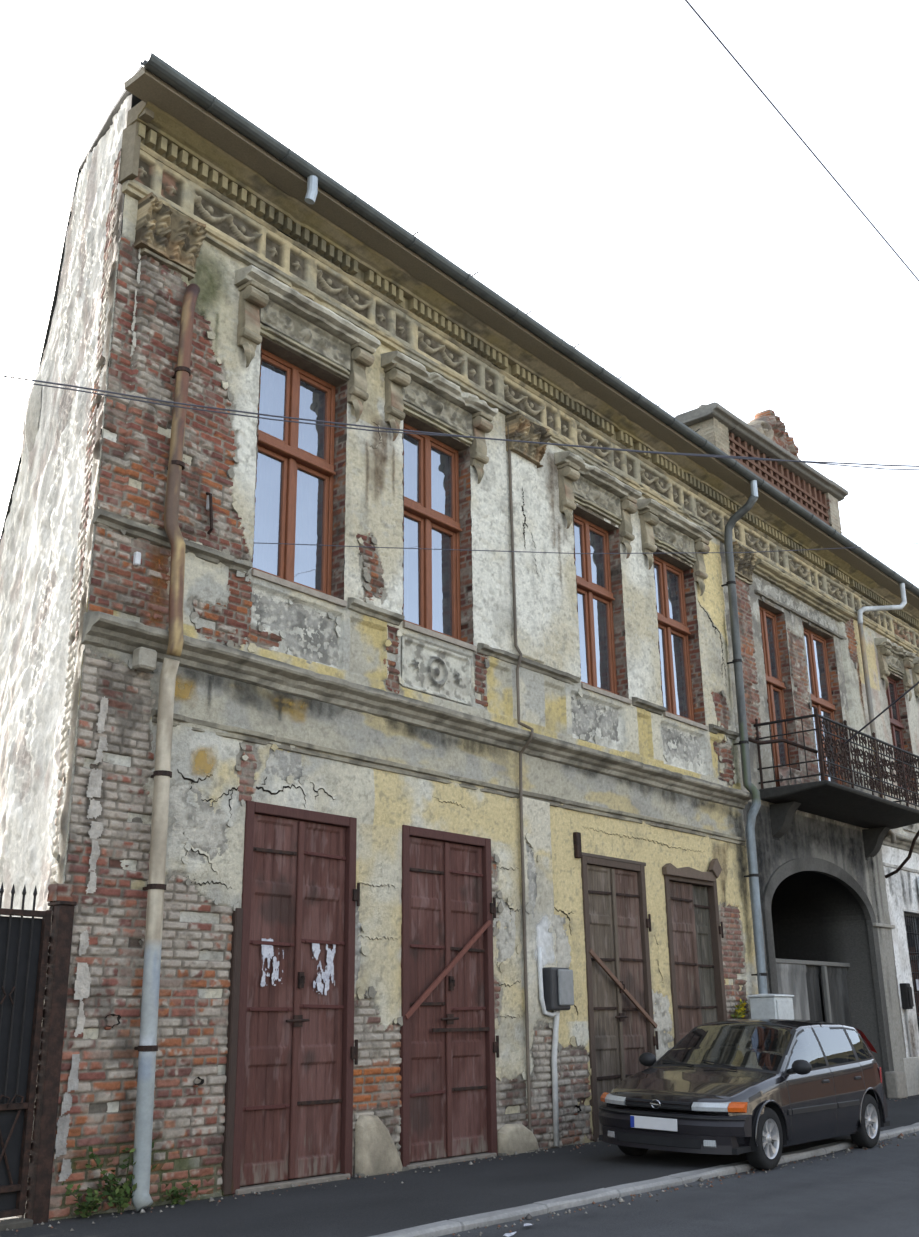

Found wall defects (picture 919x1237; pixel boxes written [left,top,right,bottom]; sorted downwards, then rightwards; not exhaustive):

flaking render [356,533,384,604]
flaking render [49,149,343,1220]
crack [177,768,336,818]
flaking render [383,625,405,694]
peeling [661,690,737,786]
flaking render [735,577,858,783]
crack [173,823,233,889]
flaking render [718,903,750,1021]
flaking render [352,901,403,1176]
flaking render [496,1022,593,1148]